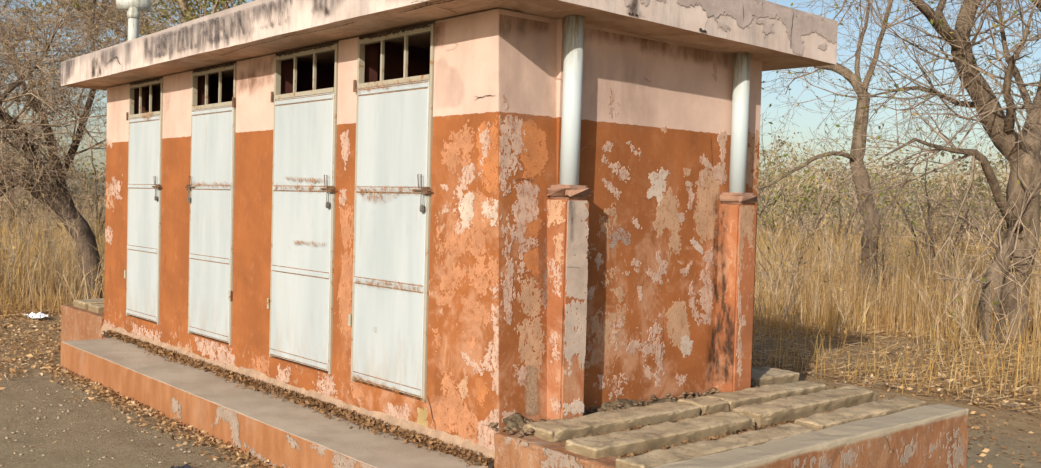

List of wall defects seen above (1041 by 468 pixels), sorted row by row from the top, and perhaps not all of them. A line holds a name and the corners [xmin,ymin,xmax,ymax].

damp [145,10,240,57]
peeling [624,0,838,55]
damp [92,43,129,77]
peeling [340,129,350,171]
peeling [429,95,727,452]
damp [709,263,734,380]
peeling [172,397,181,420]
peeling [212,405,290,468]
peeling [285,435,373,468]
spalling [537,448,583,468]
peeling [884,427,965,468]